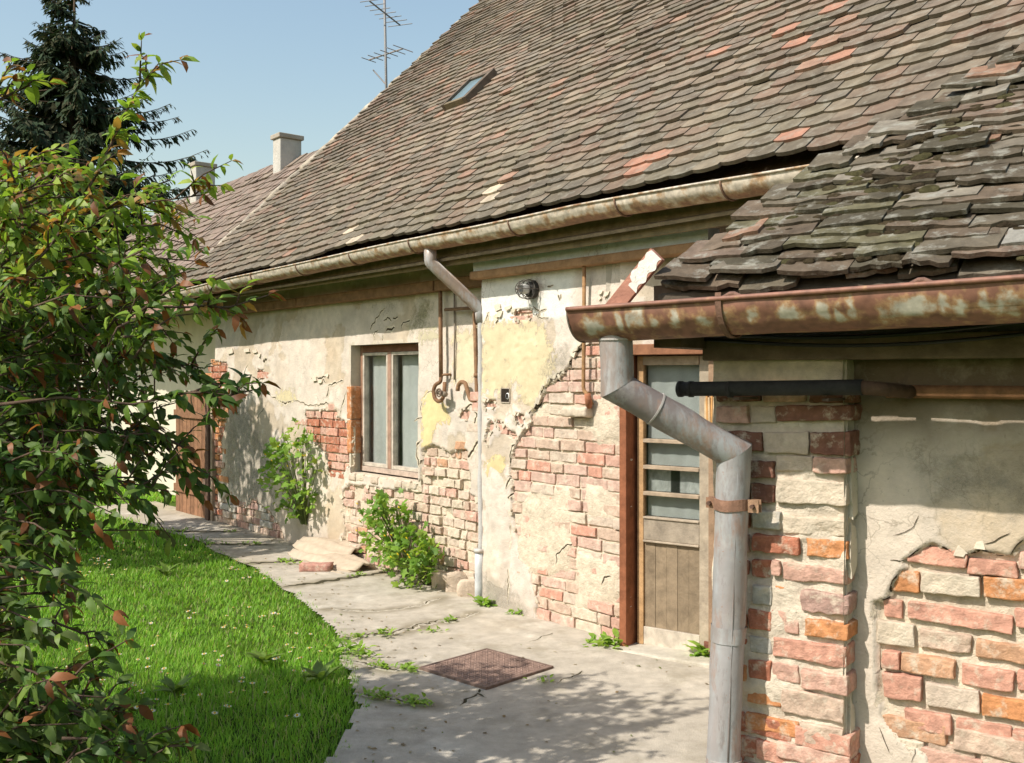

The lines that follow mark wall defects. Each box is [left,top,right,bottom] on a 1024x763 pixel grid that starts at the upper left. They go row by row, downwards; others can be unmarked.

flaking render [205,348,269,388]
crack [370,308,411,340]
flaking render [202,405,284,539]
flaking render [295,304,633,639]
flaking render [869,539,1024,763]